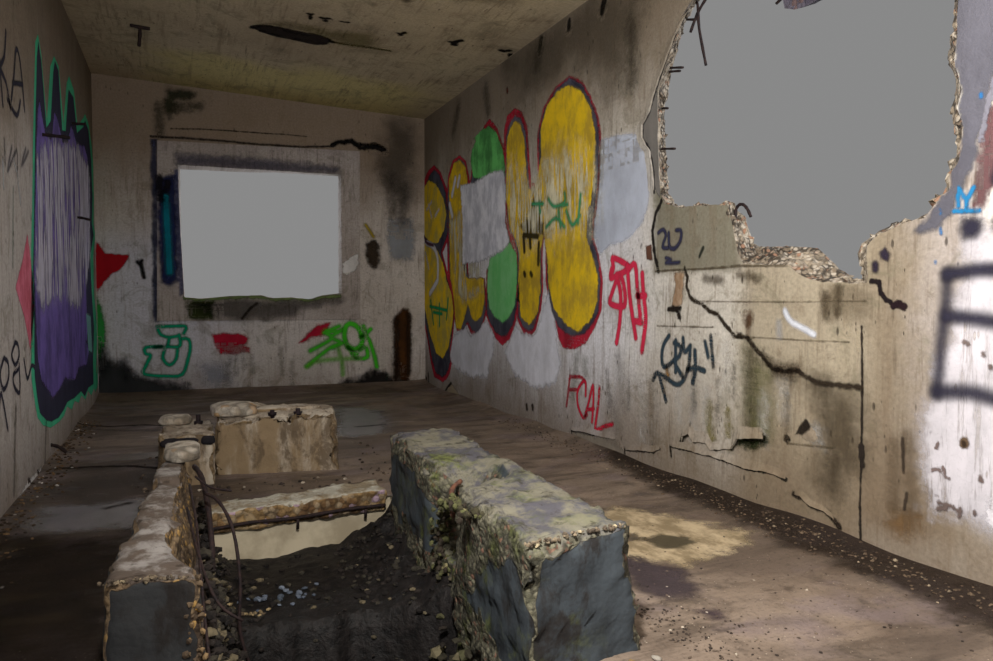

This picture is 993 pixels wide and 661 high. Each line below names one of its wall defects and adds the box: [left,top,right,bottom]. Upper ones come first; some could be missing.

peeling [636,0,693,273]
spalling [916,0,993,233]
spalling [667,272,684,319]
crack [655,265,908,540]